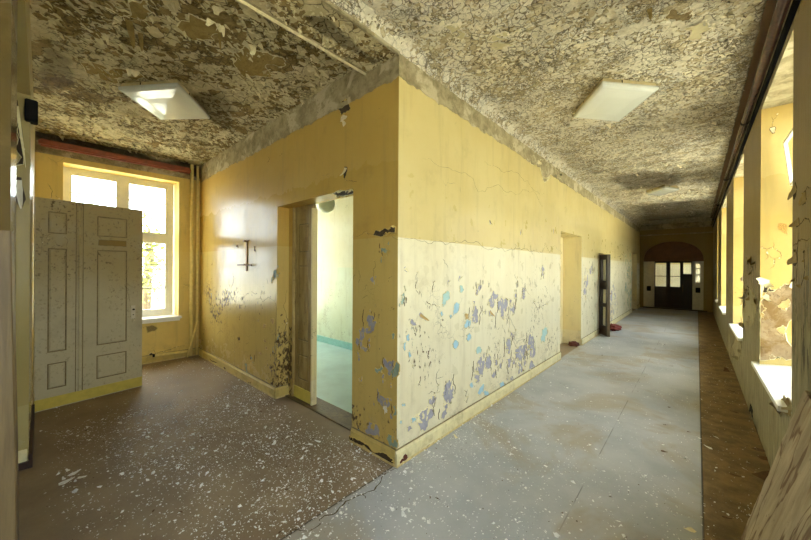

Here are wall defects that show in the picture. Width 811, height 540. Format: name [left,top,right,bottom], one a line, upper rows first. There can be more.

peeling [39,0,388,159]
peeling [401,0,495,55]
peeling [456,0,627,95]
peeling [524,0,762,221]
flaking render [332,189,353,198]
peeling [373,225,396,263]
peeling [738,277,792,361]
spalling [40,276,701,540]
crack [289,468,397,538]